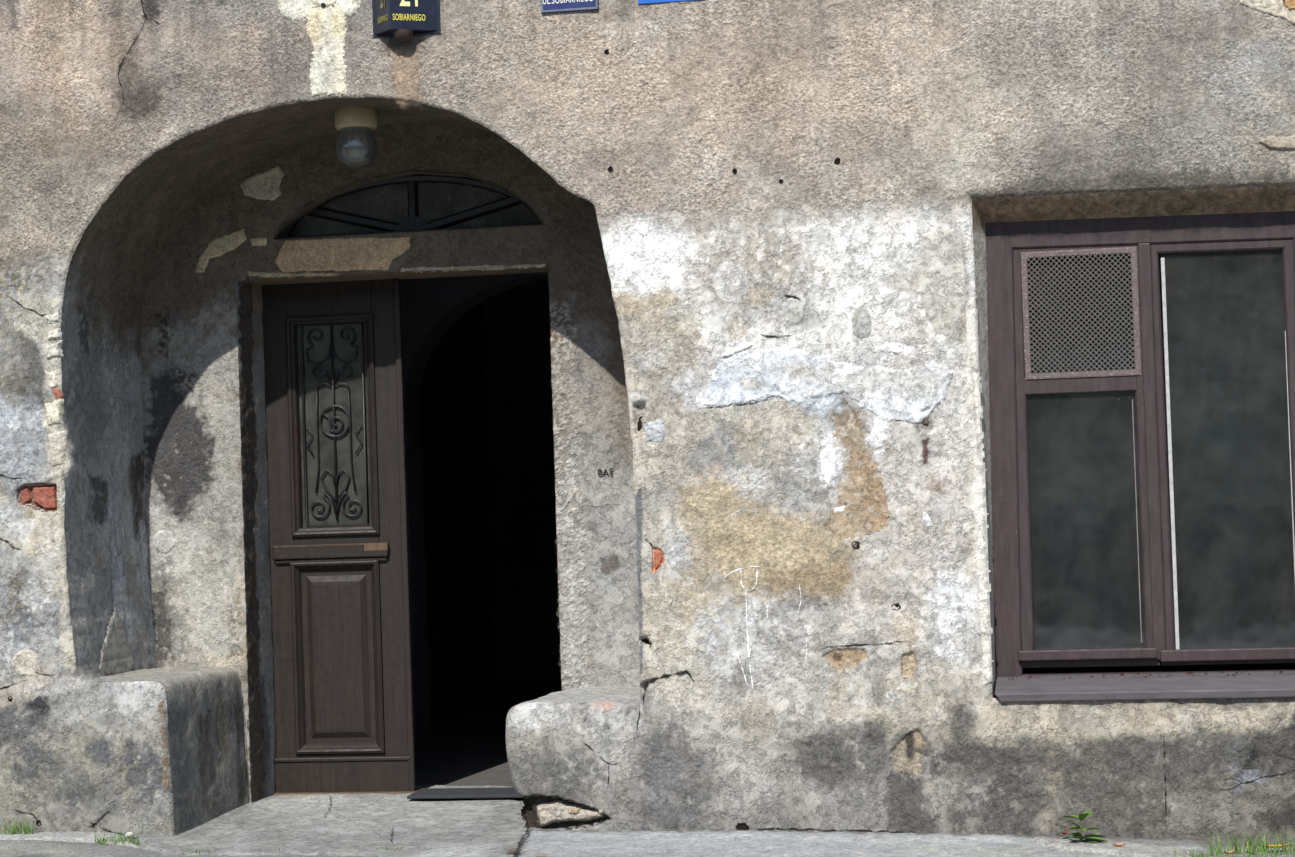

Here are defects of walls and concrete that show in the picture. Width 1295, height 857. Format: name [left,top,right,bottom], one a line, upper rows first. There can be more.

crack [114,0,160,122]
flaking render [1239,0,1295,25]
flaking render [1258,135,1295,150]
flaking render [17,484,57,512]
flaking render [44,313,67,467]
flaking render [195,229,546,803]
peeling [701,342,954,549]
crack [637,669,694,730]
damp [793,728,935,834]
damp [916,724,1261,837]